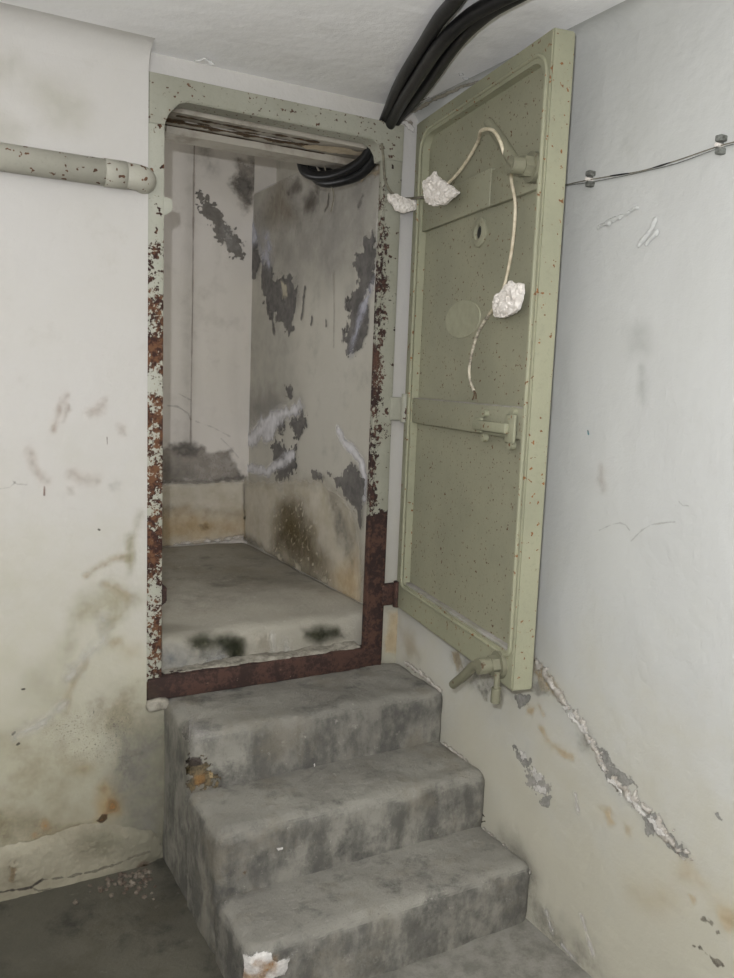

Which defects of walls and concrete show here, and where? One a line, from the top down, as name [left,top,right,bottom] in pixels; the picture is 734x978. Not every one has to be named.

peeling [195,190,313,337]
peeling [341,231,376,358]
peeling [270,409,308,483]
leakage [191,635,243,660]
leakage [306,627,339,642]
spalling [185,753,221,792]
flaking render [512,658,693,861]
spalling [243,951,289,978]